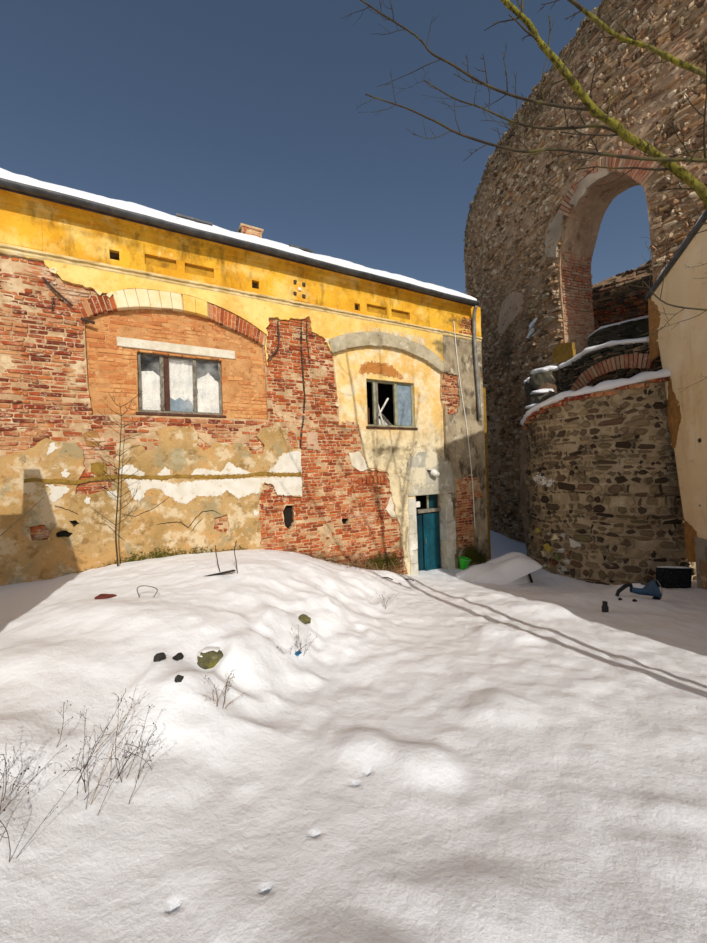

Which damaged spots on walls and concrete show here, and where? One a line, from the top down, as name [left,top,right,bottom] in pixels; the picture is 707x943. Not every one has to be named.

spalling [0,254,407,574]
spalling [440,373,459,414]
spalling [455,474,483,549]
spalling [683,519,707,590]